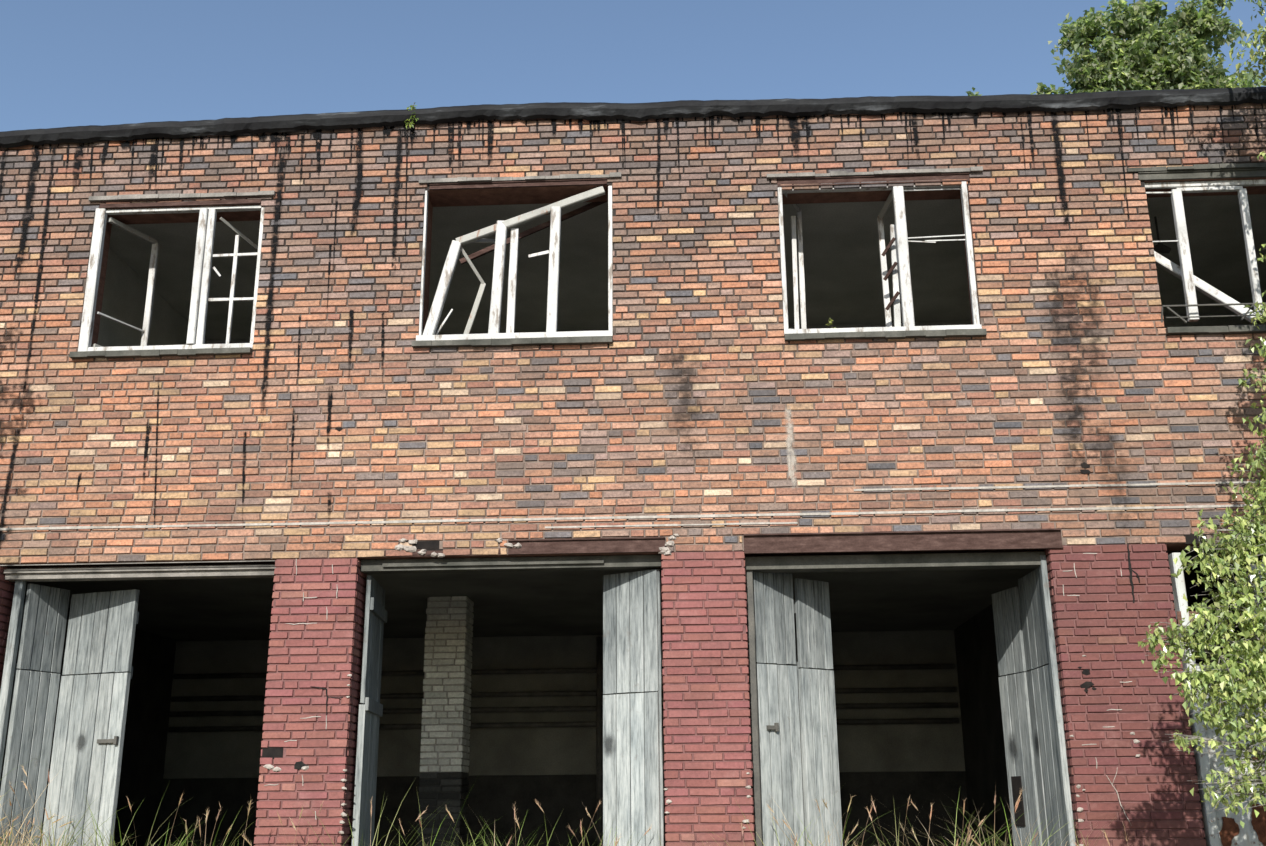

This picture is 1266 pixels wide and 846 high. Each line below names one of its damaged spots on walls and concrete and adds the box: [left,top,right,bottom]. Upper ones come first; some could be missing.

damp [350,128,363,235]
damp [383,124,415,267]
damp [433,120,494,167]
damp [646,118,680,218]
damp [899,112,981,154]
damp [1051,111,1069,223]
damp [1085,108,1139,217]
damp [15,137,164,393]
damp [179,129,332,412]
damp [0,430,20,541]
damp [143,385,159,524]
rust [1219,801,1266,846]